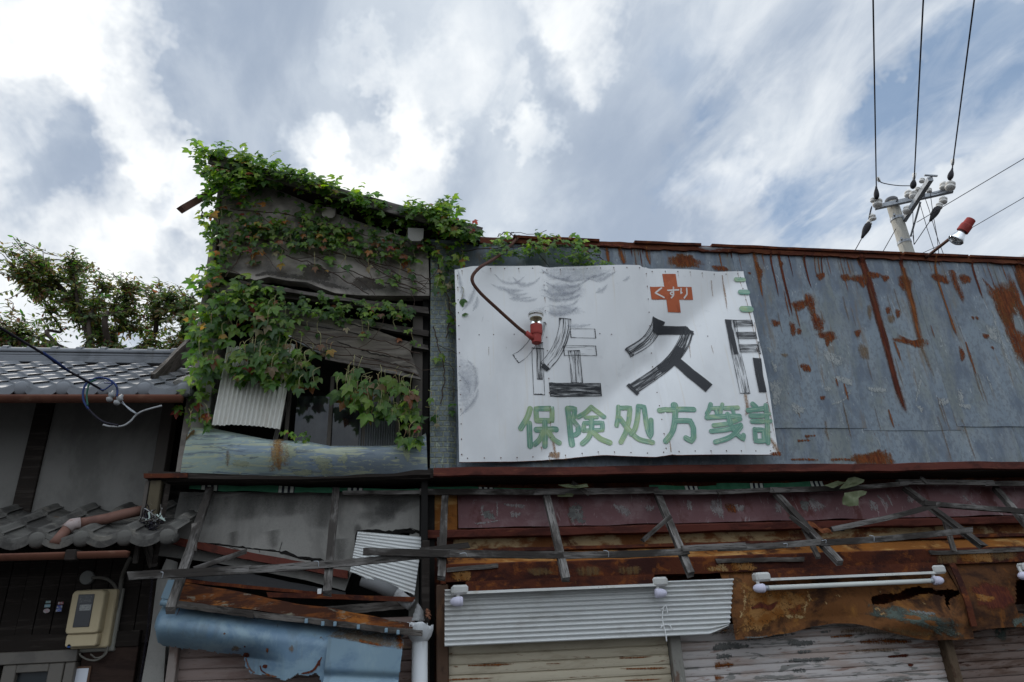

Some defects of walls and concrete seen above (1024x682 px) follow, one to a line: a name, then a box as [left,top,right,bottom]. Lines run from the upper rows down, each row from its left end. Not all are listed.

rust [669,249,1024,411]
rust [831,449,893,464]
rust [334,630,404,649]